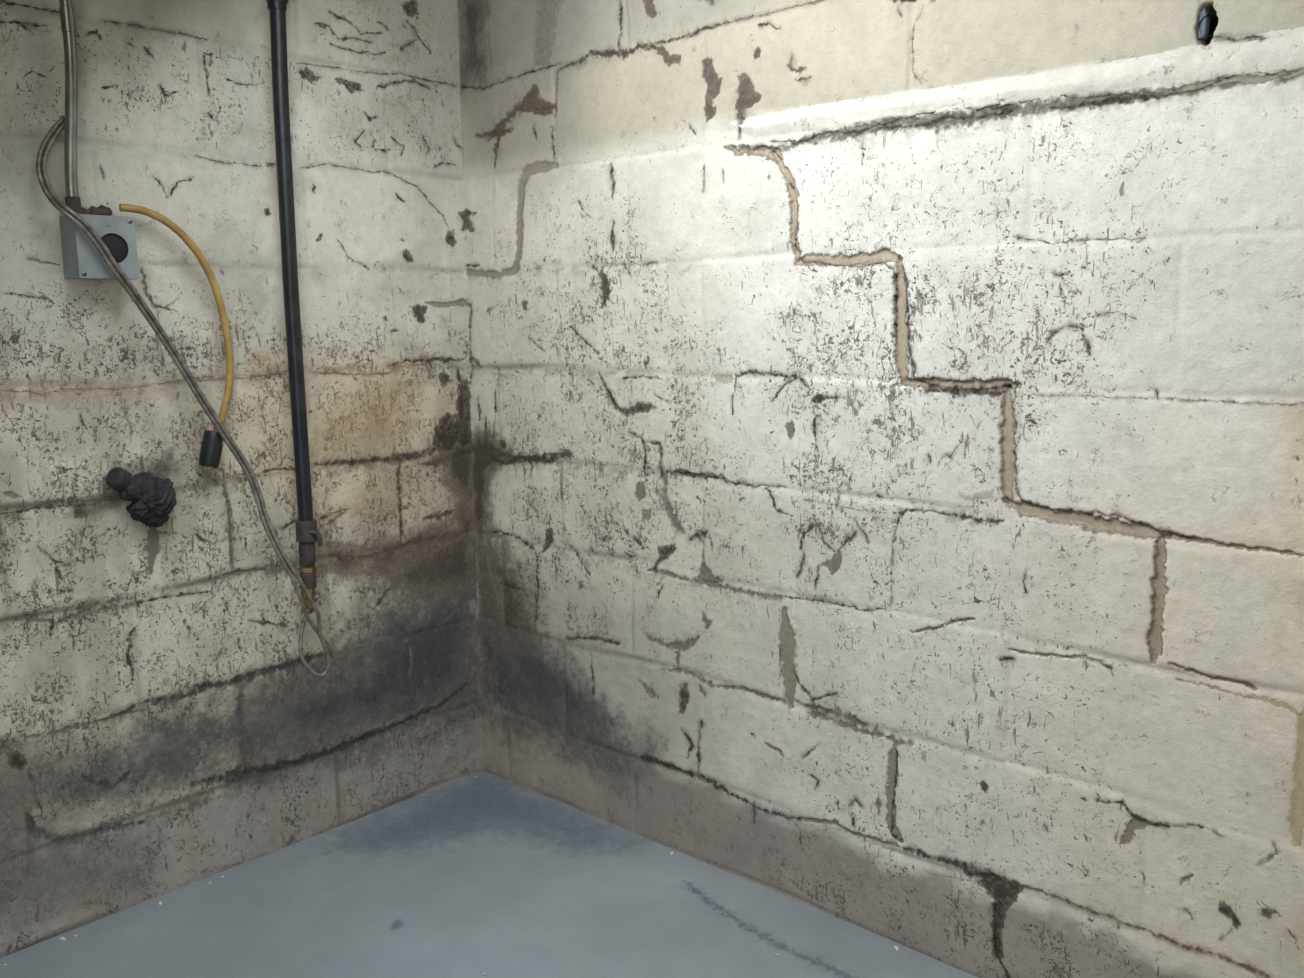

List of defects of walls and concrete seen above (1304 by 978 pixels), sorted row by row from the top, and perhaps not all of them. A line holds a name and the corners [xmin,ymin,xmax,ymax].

crack [297,0,824,115]
crack [154,156,450,231]
crack [27,258,59,266]
crack [313,160,558,398]
crack [263,428,461,562]
crack [490,440,572,474]
crack [566,0,1304,846]
crack [0,485,321,858]
damp [49,432,655,801]
crack [492,531,539,622]
crack [191,683,468,787]
crack [1004,881,1269,978]